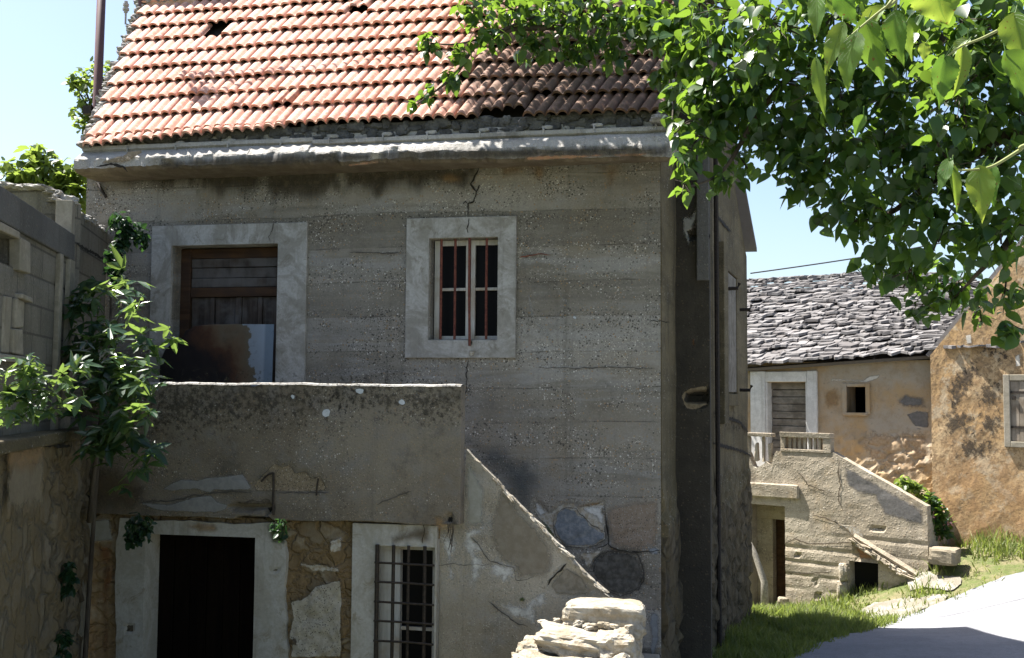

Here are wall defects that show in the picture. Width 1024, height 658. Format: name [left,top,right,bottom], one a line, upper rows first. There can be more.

crack [463,168,480,232]
water stain [938,347,1007,459]
spalling [238,464,326,512]
crack [785,461,852,545]
crack [439,563,566,585]